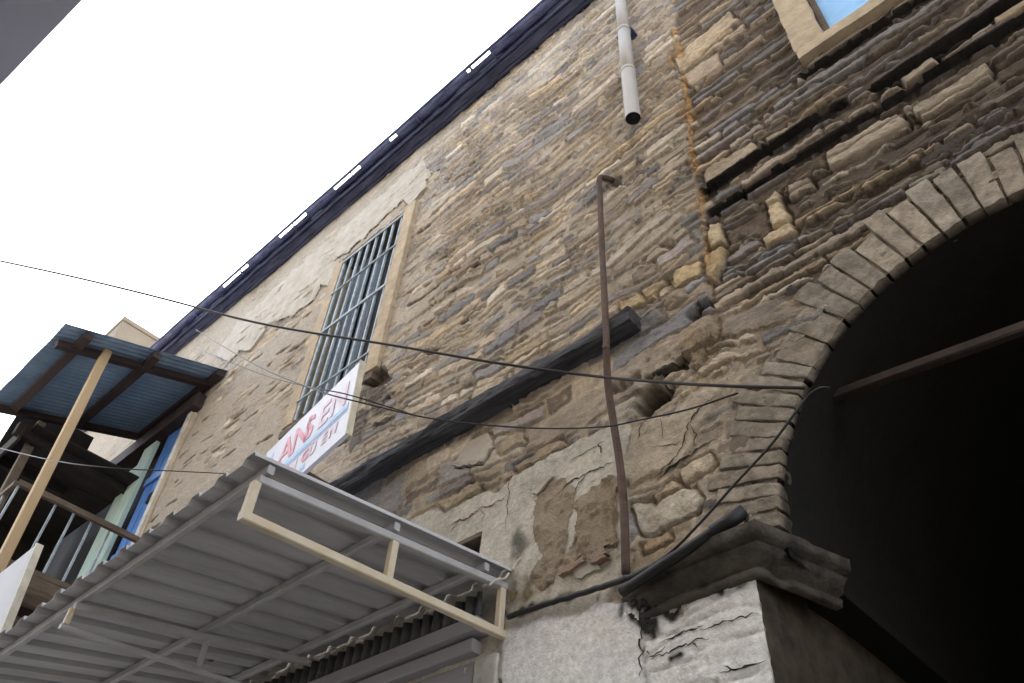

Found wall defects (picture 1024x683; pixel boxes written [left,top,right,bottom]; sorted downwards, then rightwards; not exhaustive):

corrosion [669,29,700,170]
peeling [216,159,433,368]
crack [448,476,512,532]
spalling [530,475,619,591]
crack [541,441,612,493]
crack [638,398,718,480]
crack [638,612,757,679]
crack [719,661,764,674]